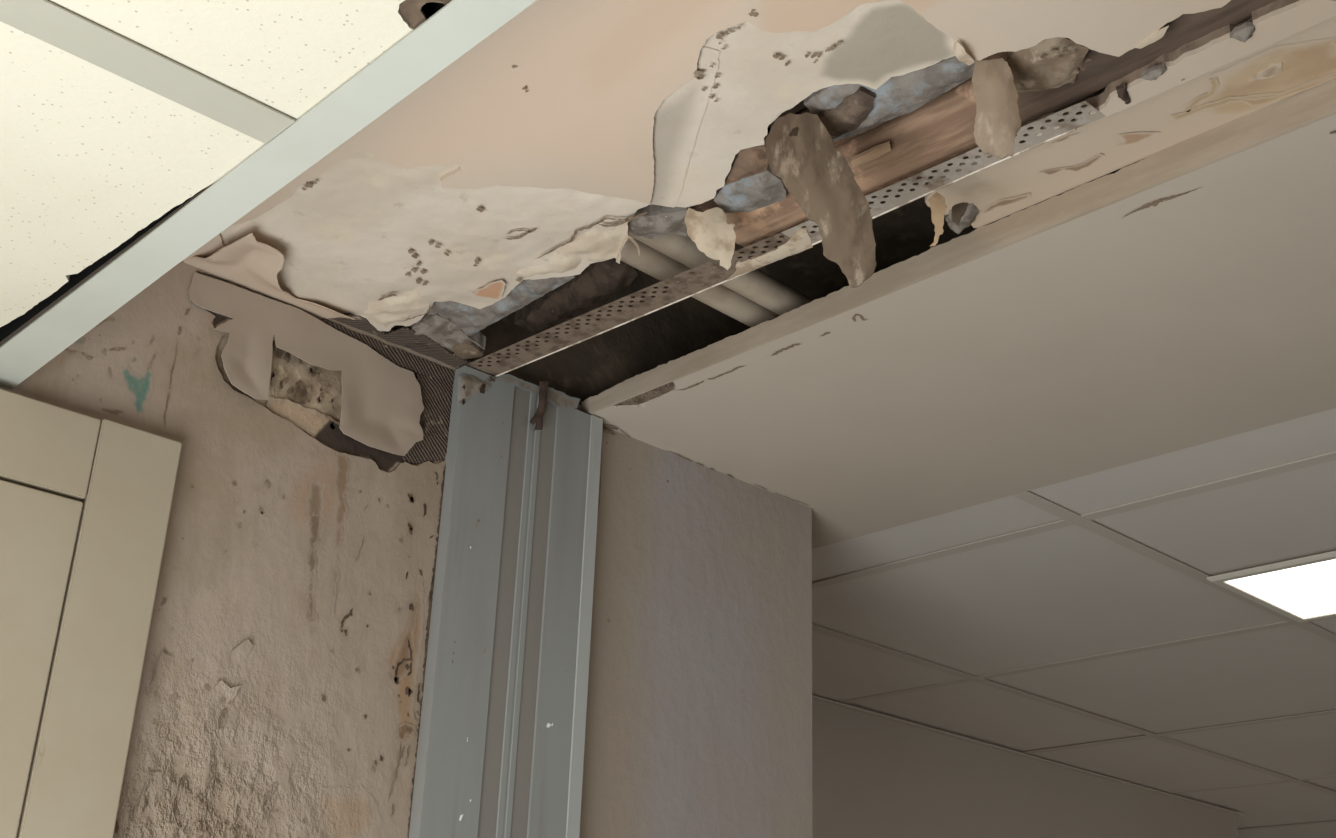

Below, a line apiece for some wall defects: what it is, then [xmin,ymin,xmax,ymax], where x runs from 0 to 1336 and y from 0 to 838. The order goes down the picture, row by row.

flaking render [1007,37,1092,92]
peeling [1135,26,1169,49]
leakage [1171,37,1336,121]
peeling [184,1,975,473]
leakage [272,452,349,538]
leakage [389,664,420,719]